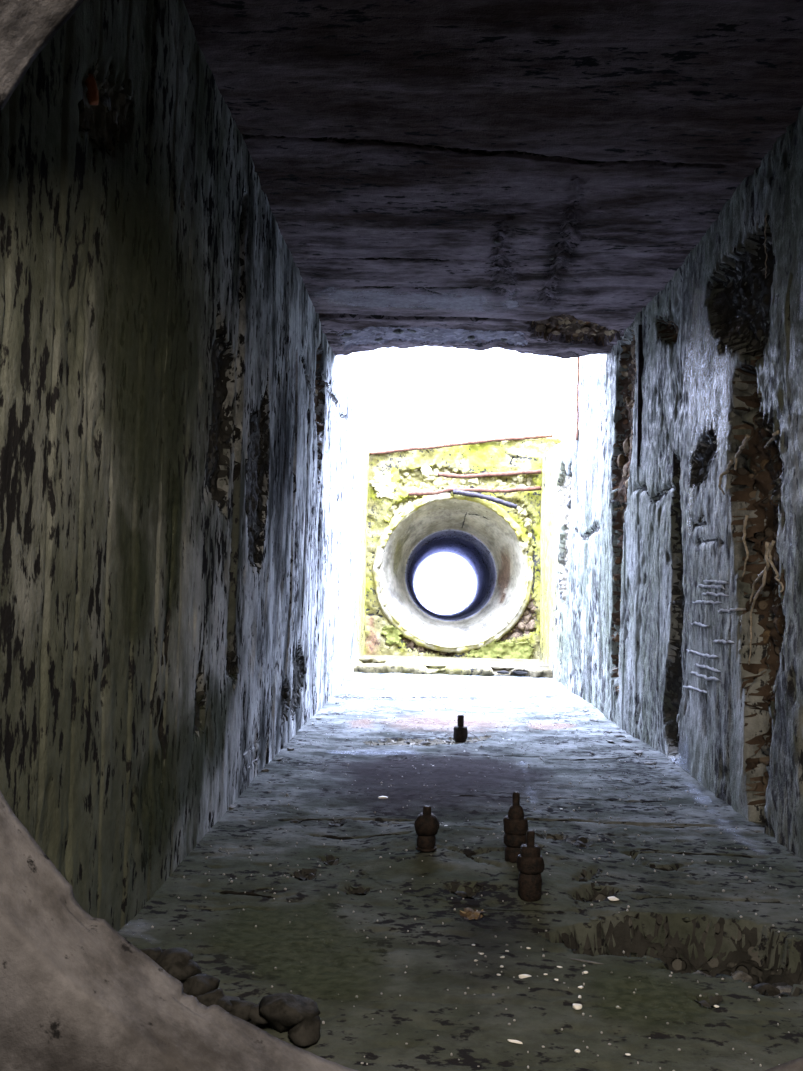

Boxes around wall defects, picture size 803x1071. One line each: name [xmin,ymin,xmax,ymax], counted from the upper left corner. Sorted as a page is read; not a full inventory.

damp [693,579,747,614]
damp [683,639,735,694]
spalling [572,868,622,902]
spalling [545,913,803,997]